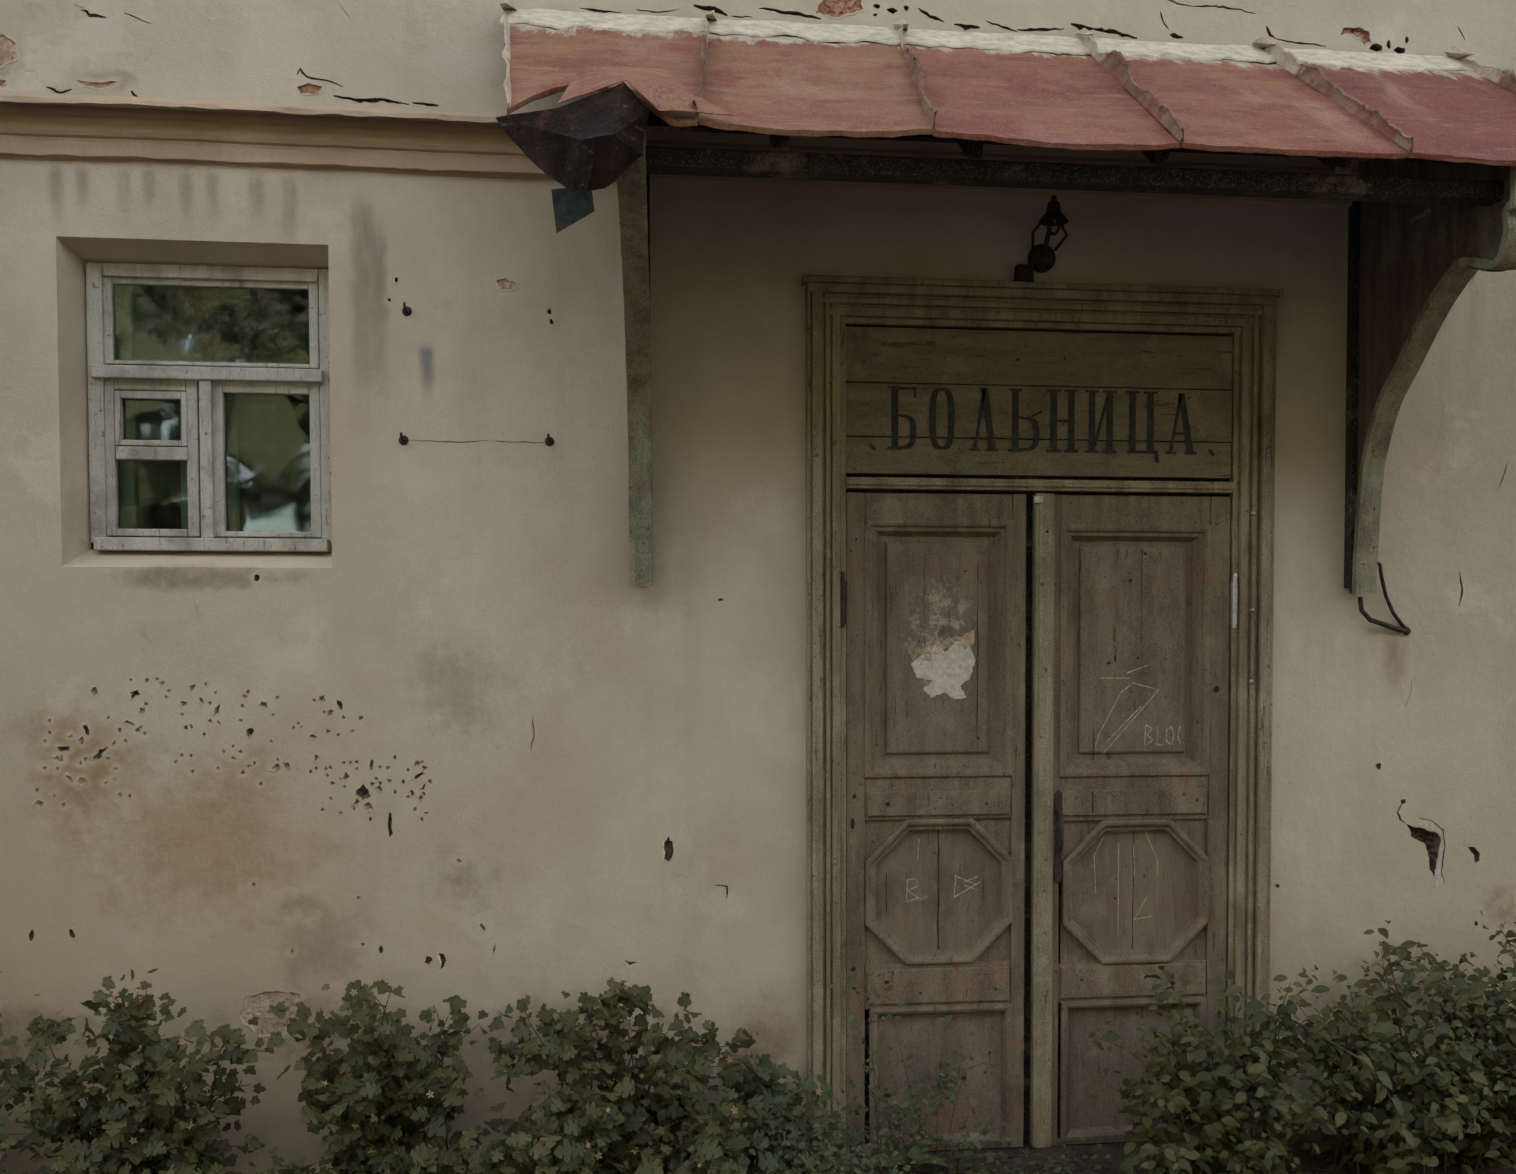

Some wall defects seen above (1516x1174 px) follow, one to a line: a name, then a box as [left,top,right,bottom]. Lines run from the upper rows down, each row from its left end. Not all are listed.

peeling [816,0,909,20]
crack [918,0,1322,46]
peeling [0,34,21,86]
crack [47,86,72,94]
peeling [77,80,119,90]
crack [297,68,439,106]
spalling [43,677,221,798]
spalling [216,690,291,785]
spalling [292,694,432,821]